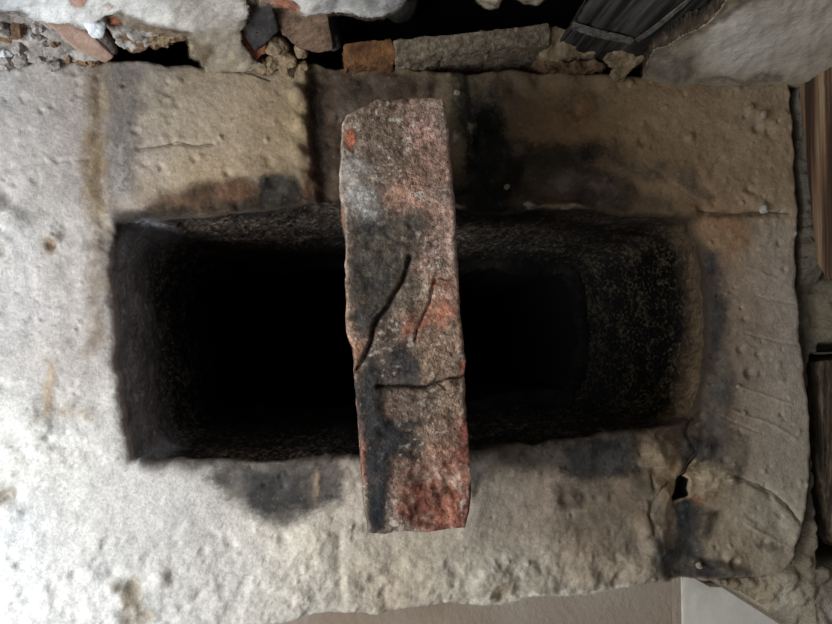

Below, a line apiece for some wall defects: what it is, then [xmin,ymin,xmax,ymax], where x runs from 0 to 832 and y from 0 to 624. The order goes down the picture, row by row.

peeling [70,0,87,8]
peeling [259,0,308,19]
spalling [97,4,260,73]
spalling [602,50,656,83]
crack [355,258,411,370]
crack [381,375,465,391]
crack [648,442,708,535]